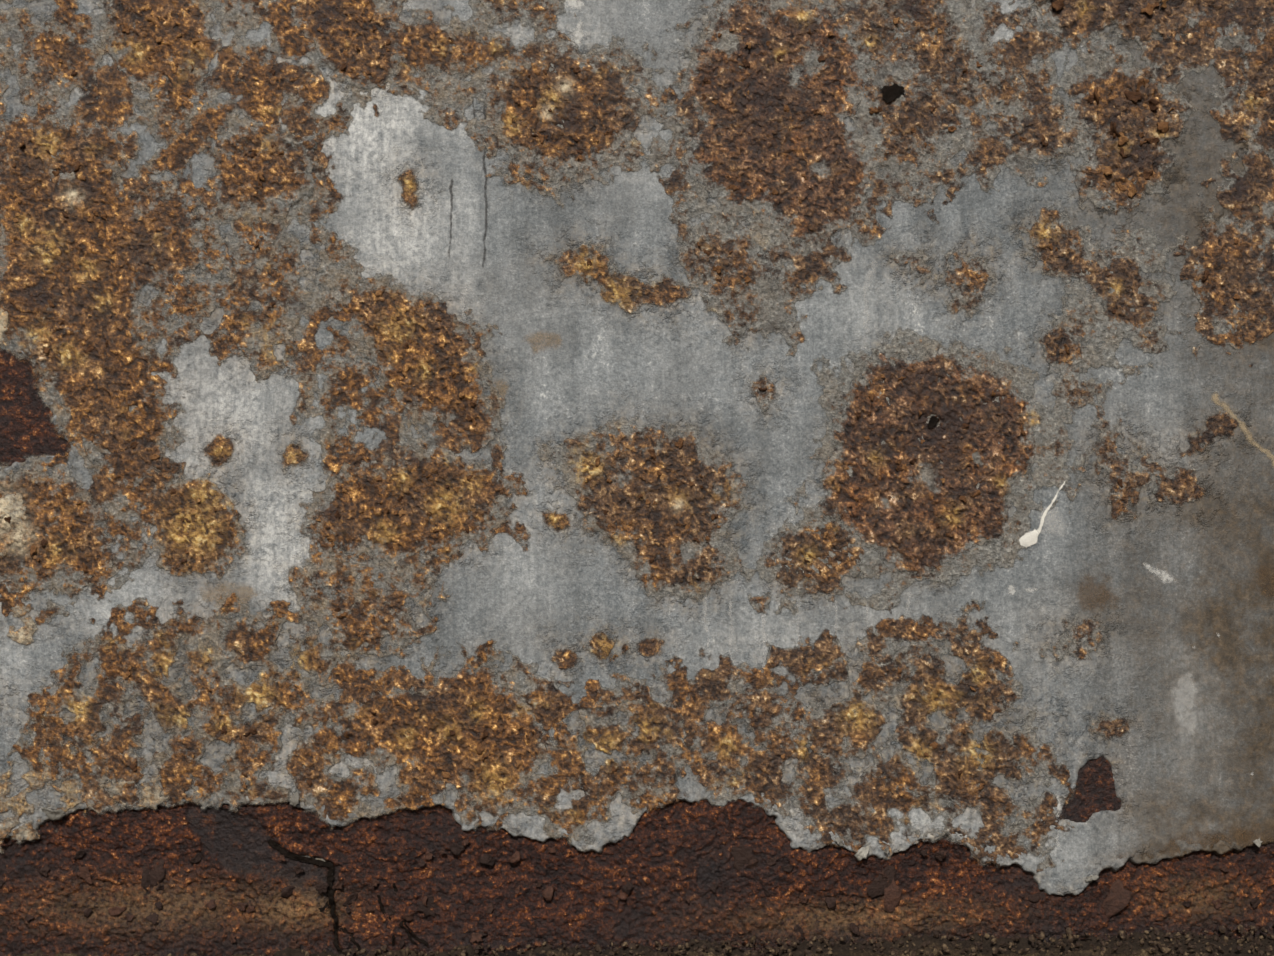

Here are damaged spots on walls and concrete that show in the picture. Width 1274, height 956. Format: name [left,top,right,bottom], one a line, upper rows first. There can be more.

rust [1237,16,1274,160]
rust [544,0,1237,340]
rust [1192,211,1274,333]
peeling [0,347,70,466]
rust [0,0,1042,830]
rust [1037,328,1081,364]
peeling [1057,756,1122,823]
peeling [0,791,1274,956]